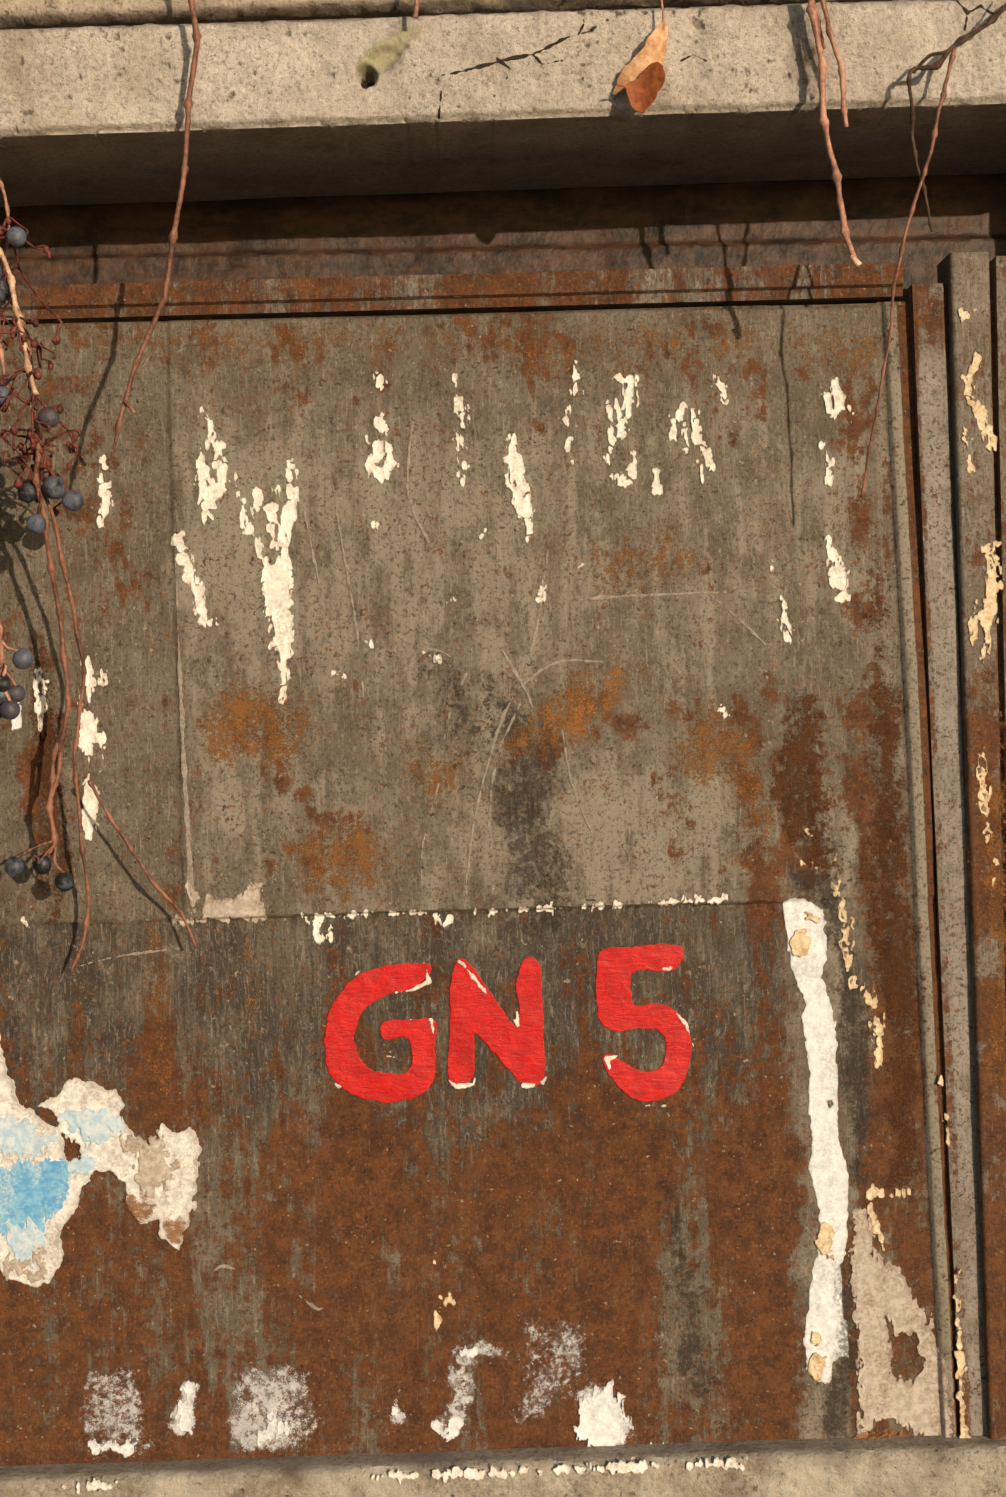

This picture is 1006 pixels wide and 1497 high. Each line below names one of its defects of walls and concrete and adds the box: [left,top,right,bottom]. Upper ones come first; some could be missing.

peeling [365,412,399,484]
peeling [503,433,535,543]
peeling [603,373,663,496]
peeling [668,402,716,486]
peeling [193,406,299,704]
peeling [967,540,1003,663]
peeling [171,530,219,907]
rust [200,682,313,769]
rust [496,656,644,763]
rust [672,596,927,1203]
rust [968,667,1006,1090]
peeling [783,853,971,1438]